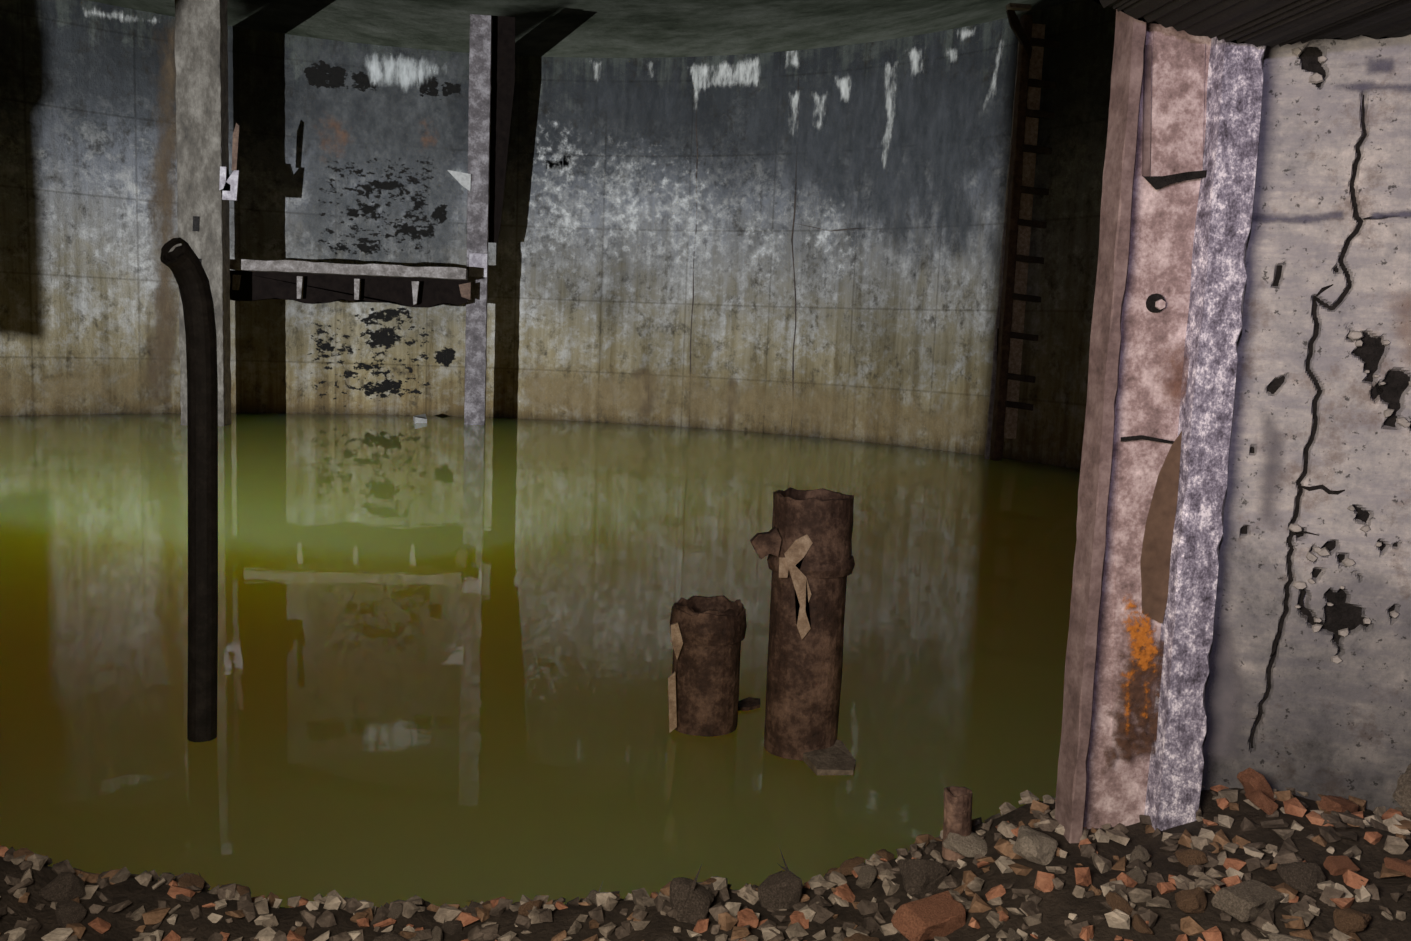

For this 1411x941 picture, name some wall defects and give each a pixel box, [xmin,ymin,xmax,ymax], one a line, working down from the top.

water stain [589,59,768,126]
water stain [768,30,1000,250]
spalling [318,156,447,256]
spalling [307,307,456,406]
crack [1250,95,1398,748]
spalling [1346,331,1411,429]
spalling [1347,505,1398,551]
spalling [1288,524,1371,664]
corrosion [1104,599,1164,767]